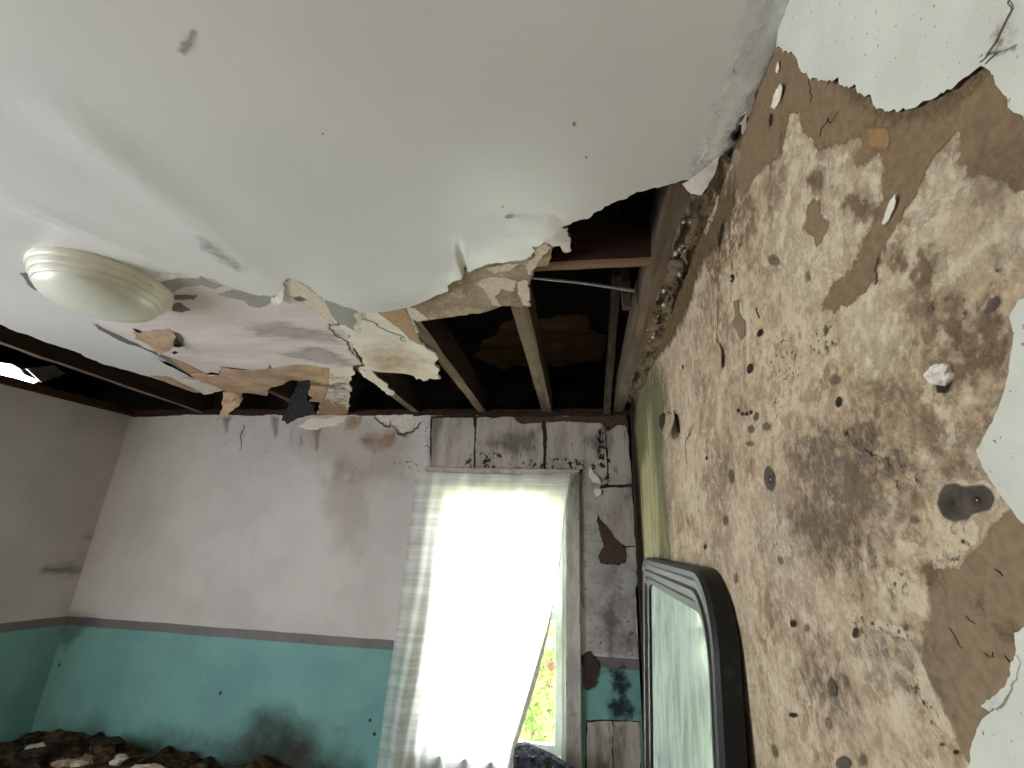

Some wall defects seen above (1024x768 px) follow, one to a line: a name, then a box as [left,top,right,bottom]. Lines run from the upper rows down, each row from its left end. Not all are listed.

crack [985,44,1018,64]
flaking render [430,0,1024,657]
leakage [778,424,921,574]
leakage [921,408,1001,523]
flaking render [920,298,1024,768]
leakage [581,651,633,717]
leakage [223,719,331,768]